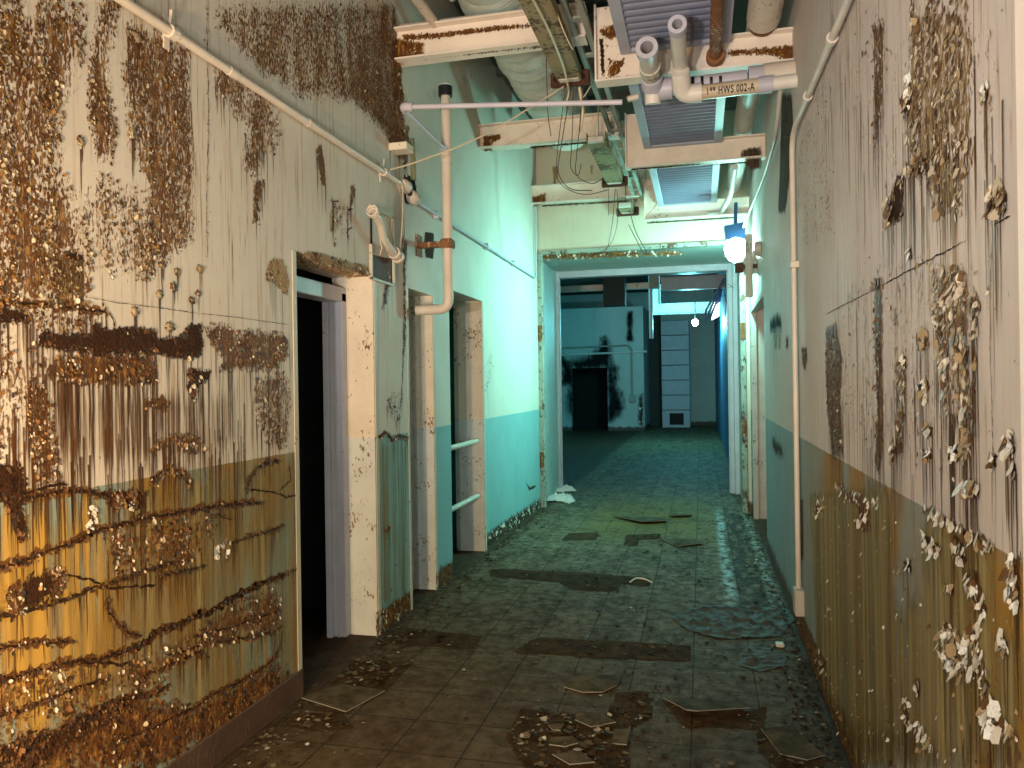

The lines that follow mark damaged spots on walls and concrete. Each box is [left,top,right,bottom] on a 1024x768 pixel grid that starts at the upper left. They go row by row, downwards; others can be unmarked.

corrosion [212,0,531,240]
corrosion [599,24,640,79]
peeling [0,0,204,429]
crack [827,240,966,314]
spalling [0,460,31,544]
peeling [86,505,98,534]
corrosion [0,586,291,768]
corrosion [0,251,292,618]
crack [0,457,297,767]
peeling [505,690,653,768]
corrosion [824,320,844,507]
peeling [800,0,1022,768]